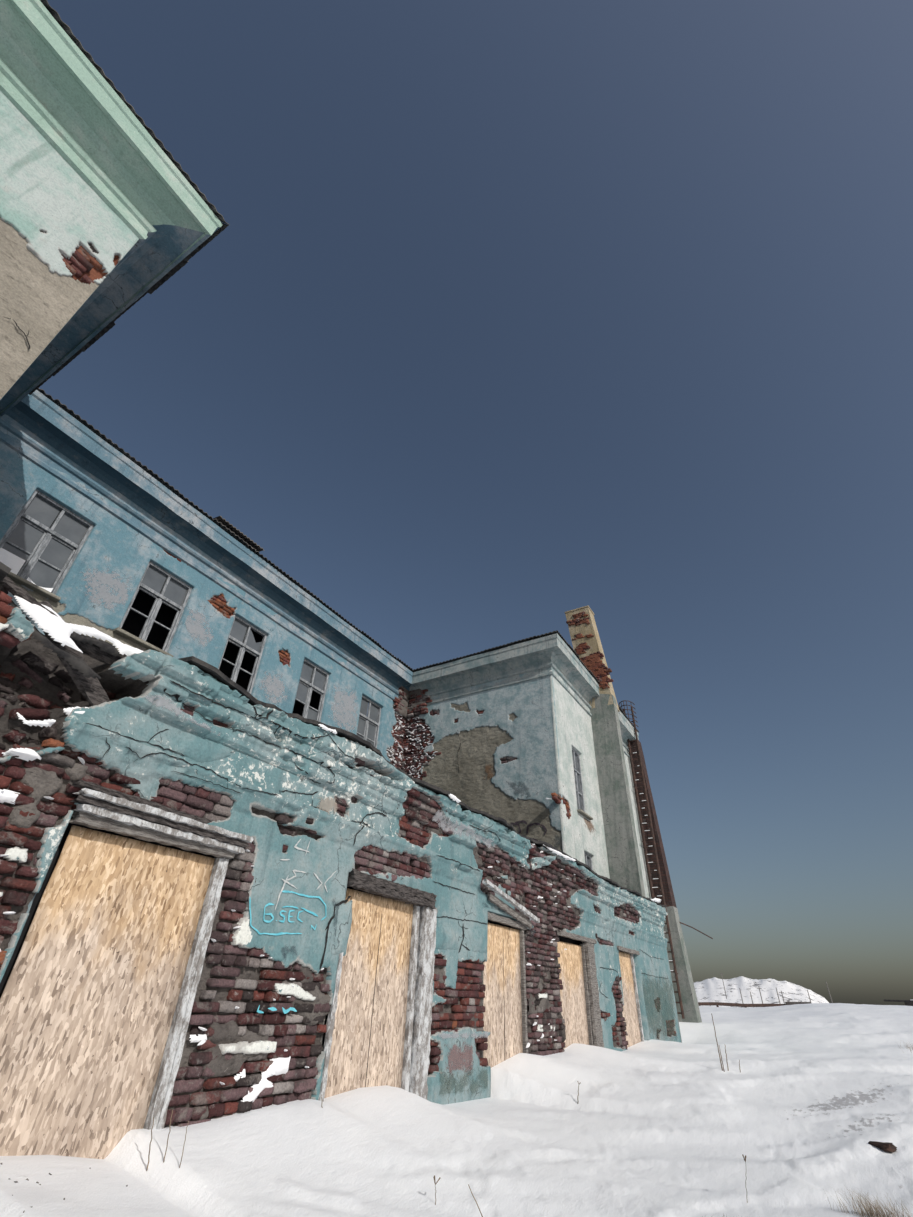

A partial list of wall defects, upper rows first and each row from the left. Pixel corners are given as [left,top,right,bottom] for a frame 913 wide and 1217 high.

flaking render [0,217,119,400]
peeling [261,650,291,703]
flaking render [566,612,613,689]
flaking render [0,581,236,969]
crack [86,680,386,844]
spalling [251,807,321,853]
flaking render [346,686,640,1056]
flaking render [164,842,331,1127]
flaking render [428,954,488,1075]